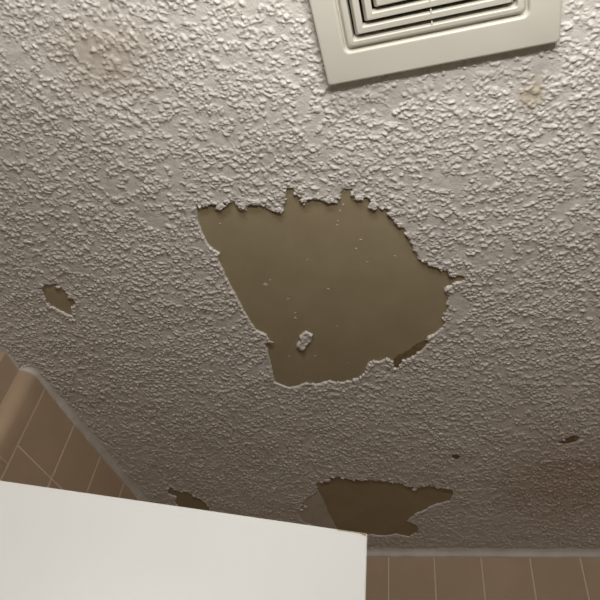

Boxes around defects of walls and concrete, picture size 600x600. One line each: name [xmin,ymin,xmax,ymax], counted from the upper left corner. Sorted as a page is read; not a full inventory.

peeling [39,284,76,316]
peeling [197,188,464,387]
peeling [164,488,210,511]
peeling [297,477,453,536]